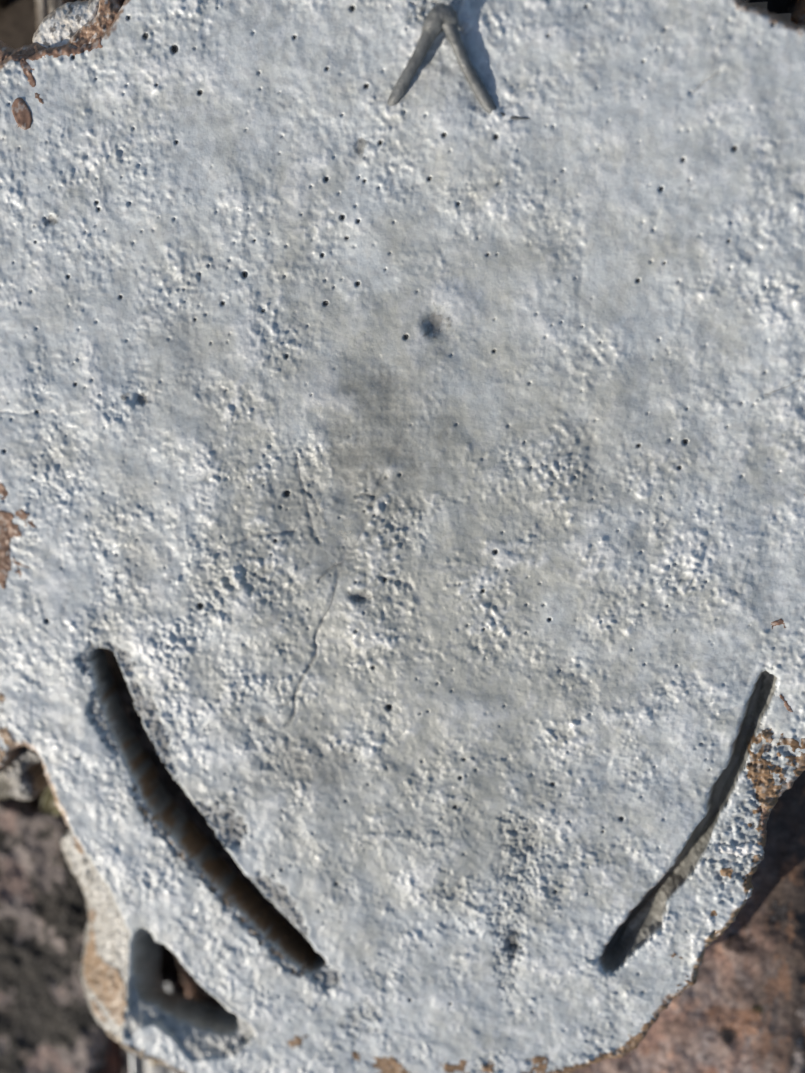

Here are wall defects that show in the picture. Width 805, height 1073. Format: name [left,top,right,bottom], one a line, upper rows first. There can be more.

peeling [0,483,37,589]
crack [296,456,319,541]
crack [279,494,375,725]
peeling [0,693,16,765]
peeling [719,728,805,909]
peeling [81,908,186,1073]
peeling [287,1034,308,1050]
peeling [352,1051,410,1073]
peeling [437,1059,469,1073]
peeling [521,961,701,1073]